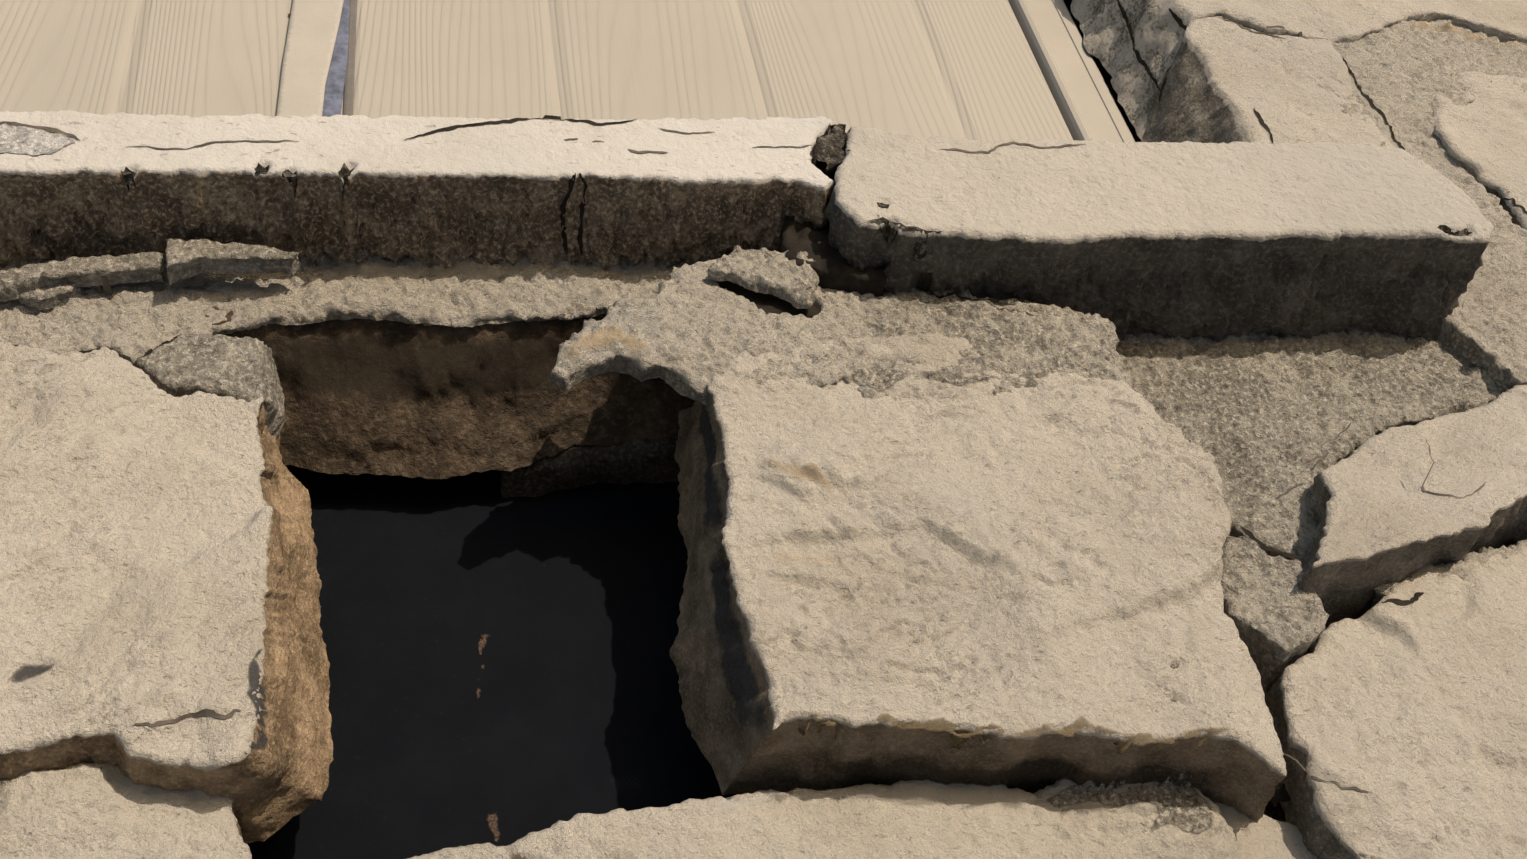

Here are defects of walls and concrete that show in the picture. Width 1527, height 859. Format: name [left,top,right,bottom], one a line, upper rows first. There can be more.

crack [1117,0,1405,150]
crack [128,140,297,149]
crack [939,141,1083,153]
crack [403,115,709,257]
crack [1496,192,1527,213]
crack [1300,422,1351,466]
water stain [699,410,722,526]
crack [1421,441,1487,498]
crack [1240,526,1302,559]
crack [1381,592,1424,605]
water stain [710,559,763,728]